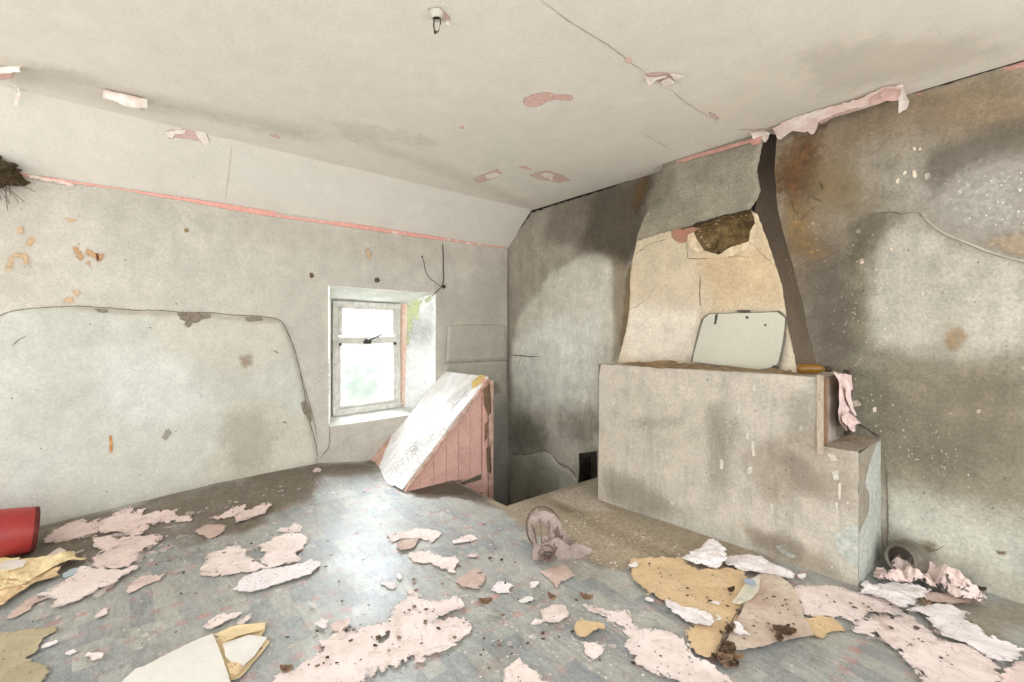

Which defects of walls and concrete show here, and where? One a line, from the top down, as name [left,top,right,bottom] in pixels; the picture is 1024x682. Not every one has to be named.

crack [542,1,644,72]
peeling [0,66,23,106]
peeling [524,92,573,107]
peeling [645,72,685,88]
peeling [165,129,210,145]
corrosion [774,132,854,257]
water stain [931,127,1024,256]
flaking render [671,202,757,259]